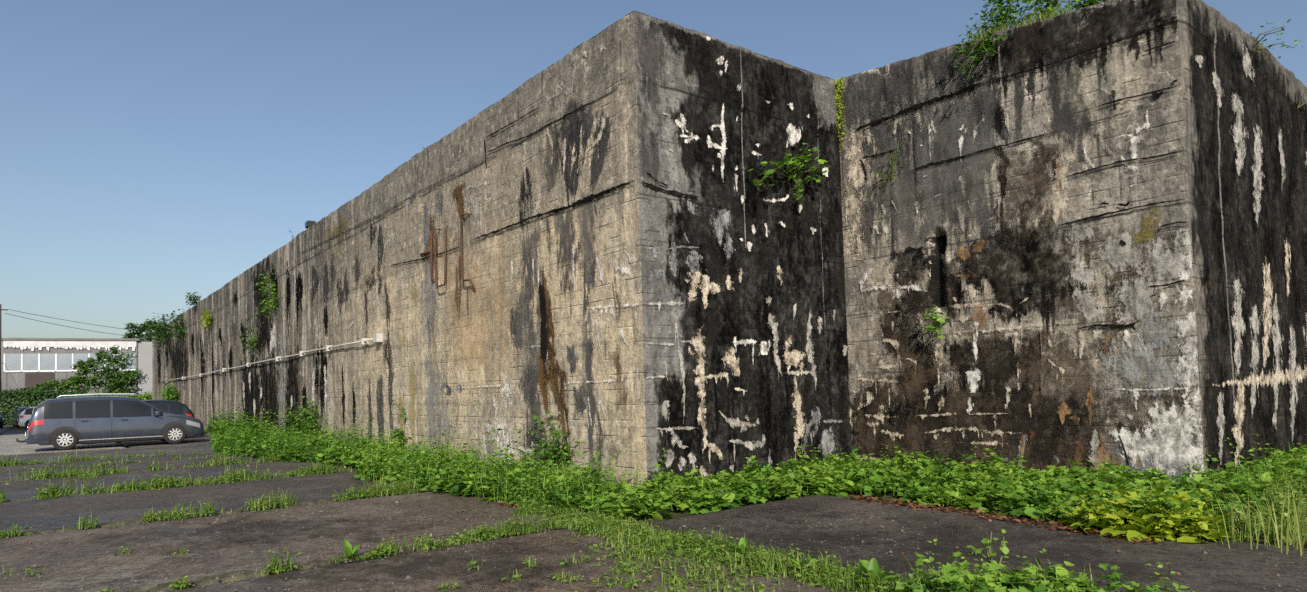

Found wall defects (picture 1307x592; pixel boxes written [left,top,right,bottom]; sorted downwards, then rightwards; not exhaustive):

rust [420,182,476,313]
leakage [157,0,1307,485]
rust [536,270,570,461]